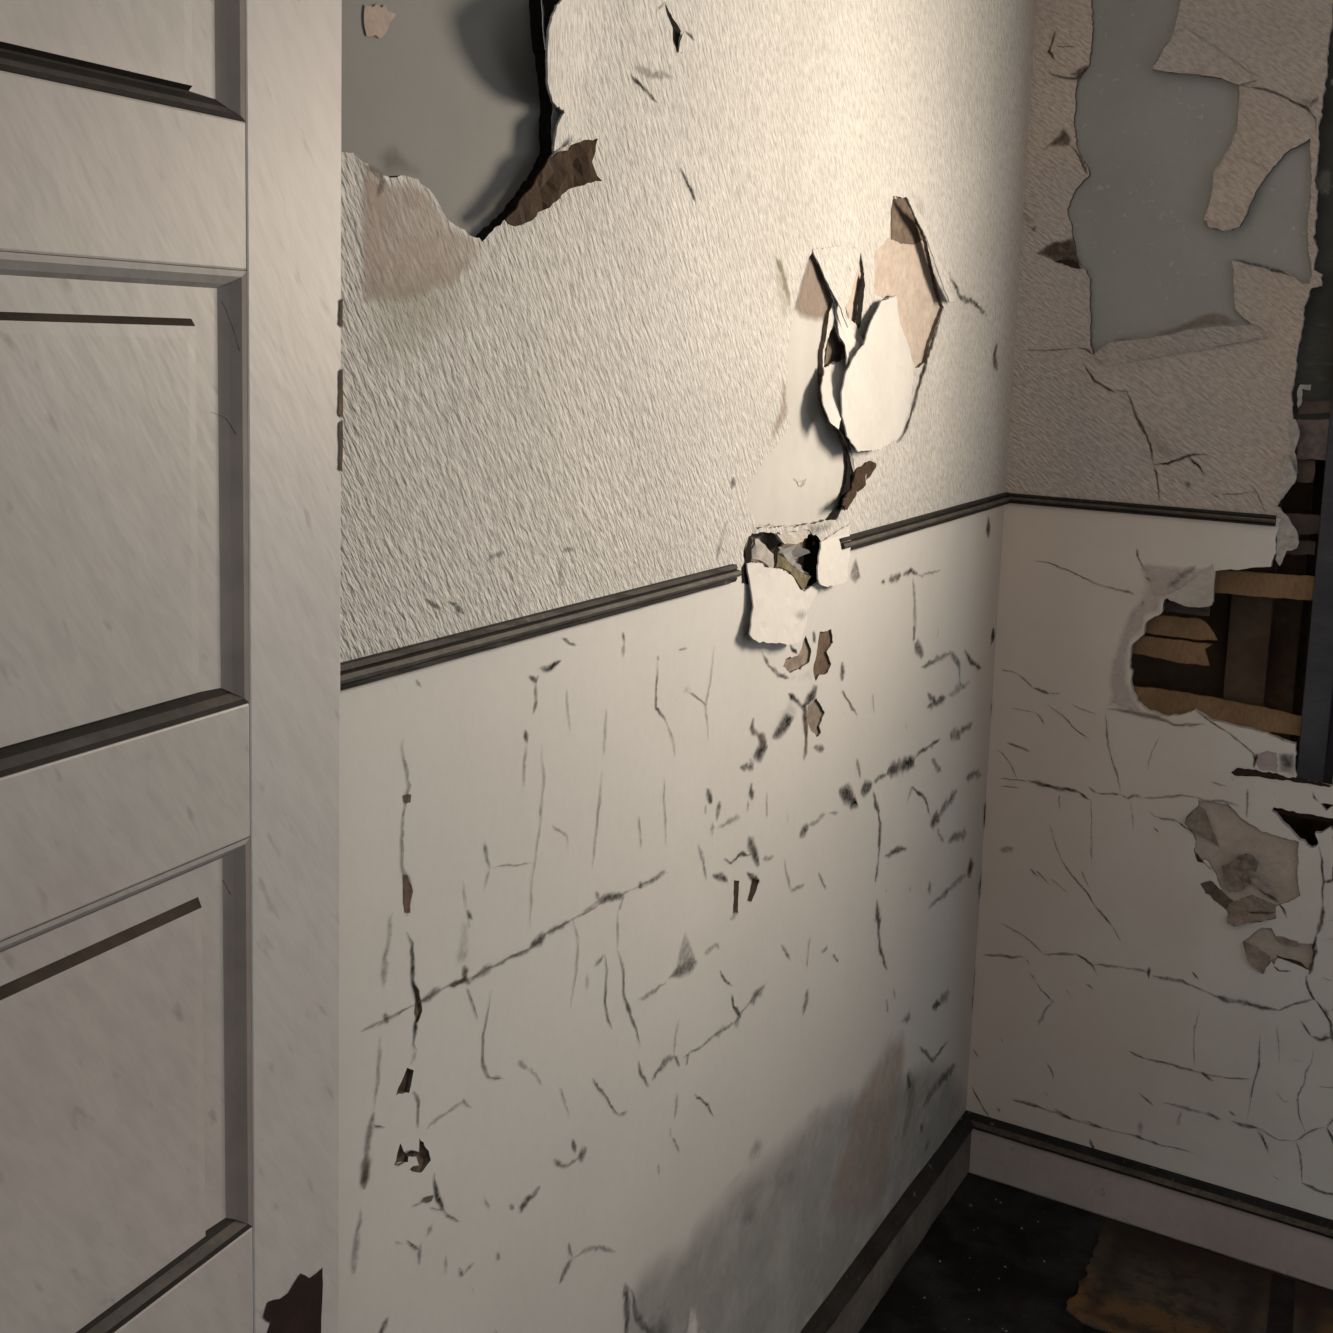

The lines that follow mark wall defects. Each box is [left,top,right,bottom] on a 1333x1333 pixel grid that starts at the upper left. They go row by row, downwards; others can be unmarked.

peeling [341,0,608,242]
peeling [1039,0,1312,367]
peeling [742,196,984,769]
crack [524,638,574,768]
flaking render [1114,564,1216,710]
crack [362,760,759,1184]
crack [704,840,826,890]
crack [1147,858,1333,1195]
flaking render [1185,800,1315,974]
peeling [263,1268,323,1333]
crack [422,1176,457,1221]
leakage [624,1049,956,1333]